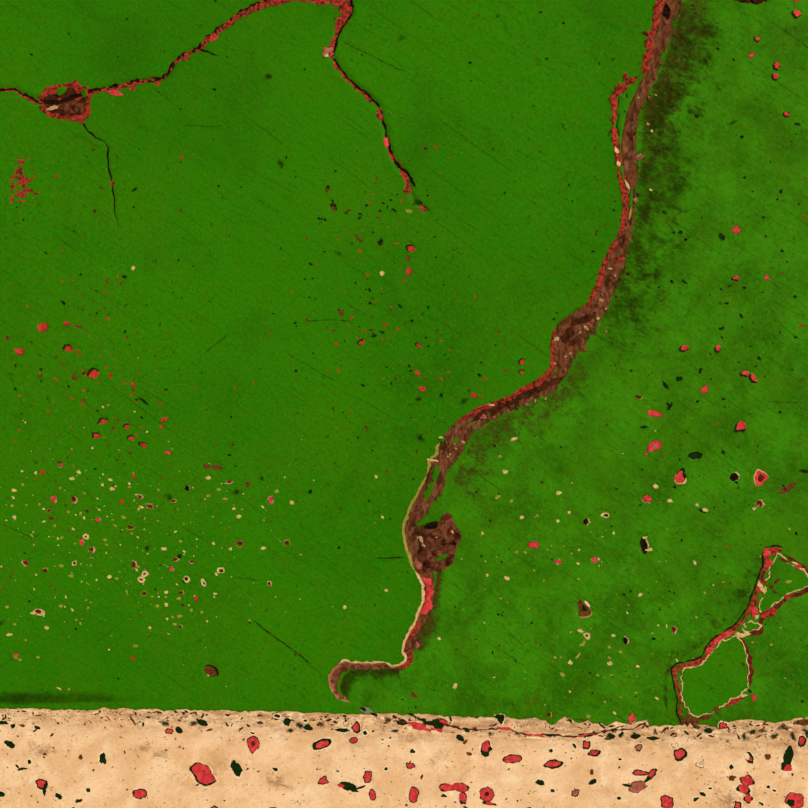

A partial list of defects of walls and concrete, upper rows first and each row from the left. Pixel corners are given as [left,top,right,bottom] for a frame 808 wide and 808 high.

crack [0,88,43,104]
crack [82,123,119,230]
crack [82,0,427,213]
crack [328,0,684,703]